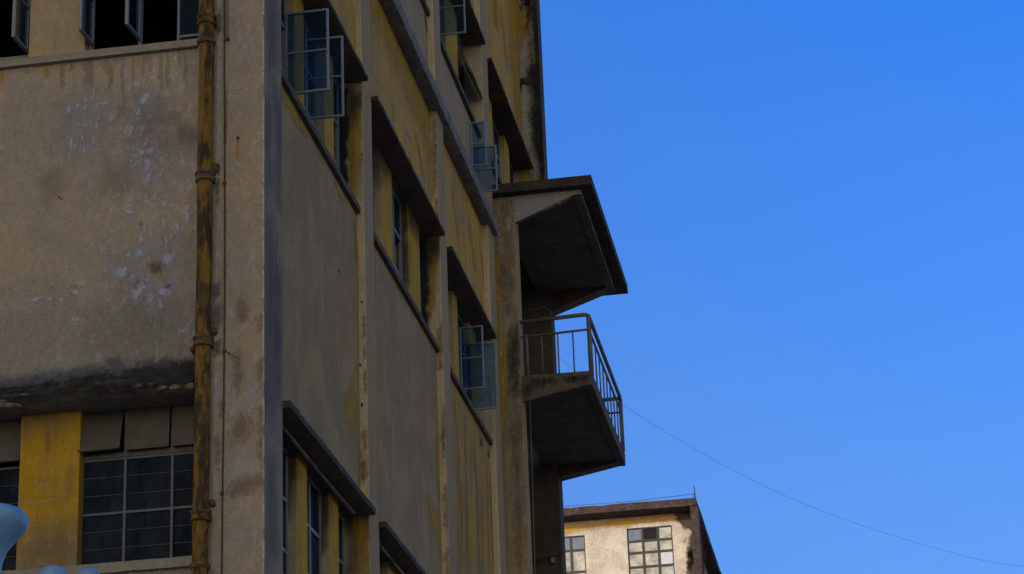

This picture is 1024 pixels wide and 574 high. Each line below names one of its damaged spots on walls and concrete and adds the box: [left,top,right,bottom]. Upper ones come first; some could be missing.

damp [500,0,545,180]
peeling [101,92,190,309]
damp [0,305,195,413]